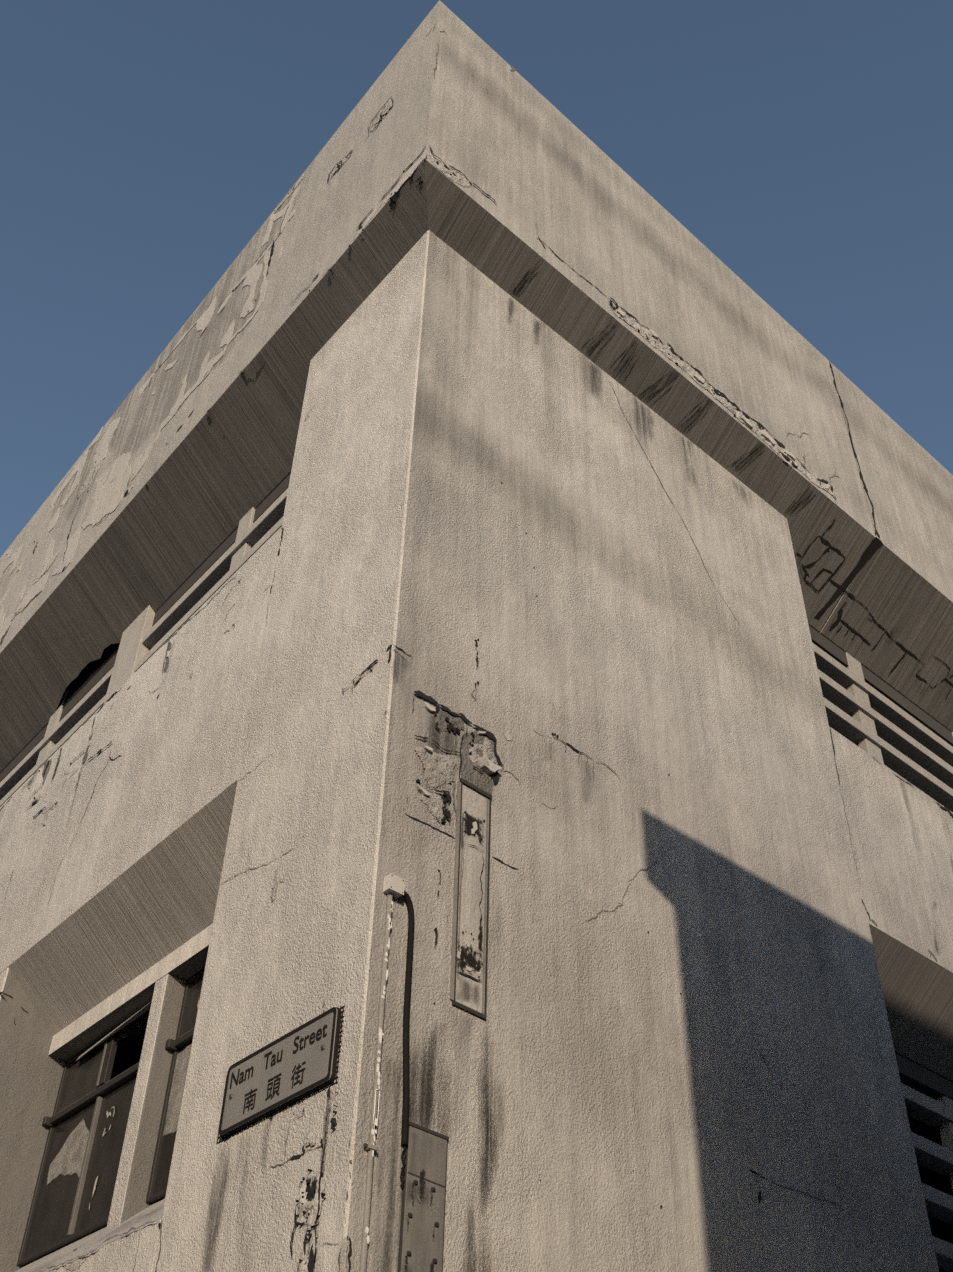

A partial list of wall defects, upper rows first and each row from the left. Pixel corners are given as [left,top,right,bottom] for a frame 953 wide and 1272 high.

crack [289,147,427,305]
peeling [0,174,304,645]
spalling [610,298,837,499]
crack [786,361,880,538]
crack [33,528,283,903]
spalling [162,639,175,673]
peeling [407,690,504,824]
crack [797,518,953,700]
crack [587,861,658,921]
peeling [290,1087,339,1272]
damp [383,1148,405,1272]
damp [409,1063,432,1128]